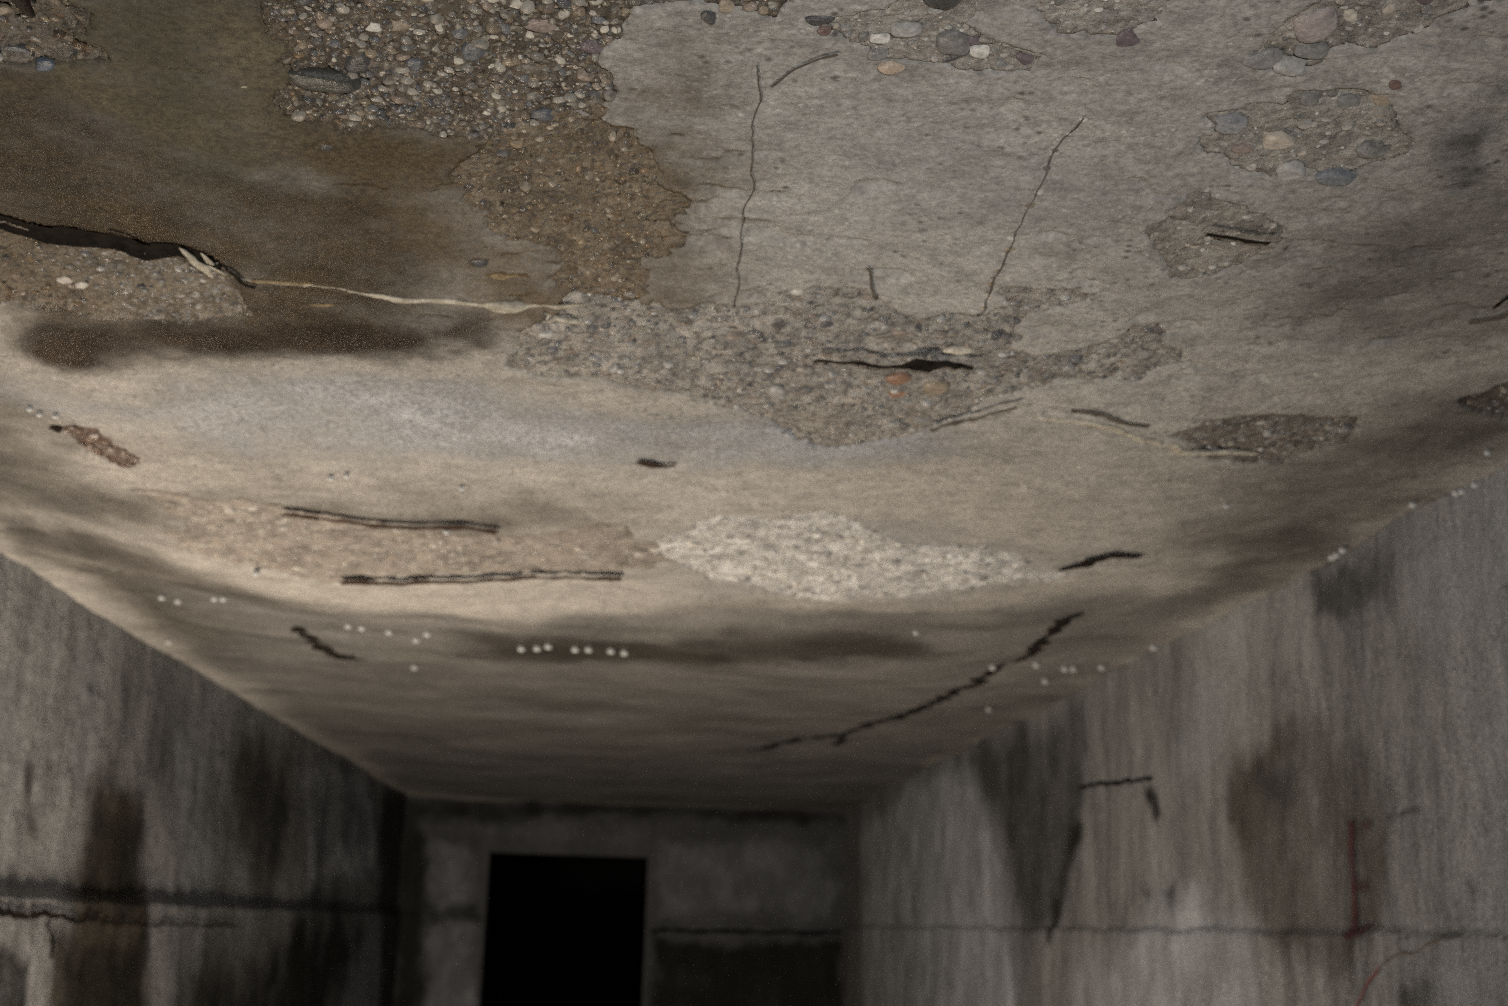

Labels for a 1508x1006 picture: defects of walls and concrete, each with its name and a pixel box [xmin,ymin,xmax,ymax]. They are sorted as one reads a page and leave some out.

spalling [0,0,109,72]
spalling [0,213,253,322]
crack [0,214,257,289]
water stain [0,0,590,371]
spalling [259,0,1182,447]
crack [733,53,838,308]
spalling [63,424,141,468]
spalling [131,488,1075,602]
crack [747,613,1084,750]
water stain [0,526,1187,1006]
water stain [1230,742,1278,875]
crack [0,907,238,959]